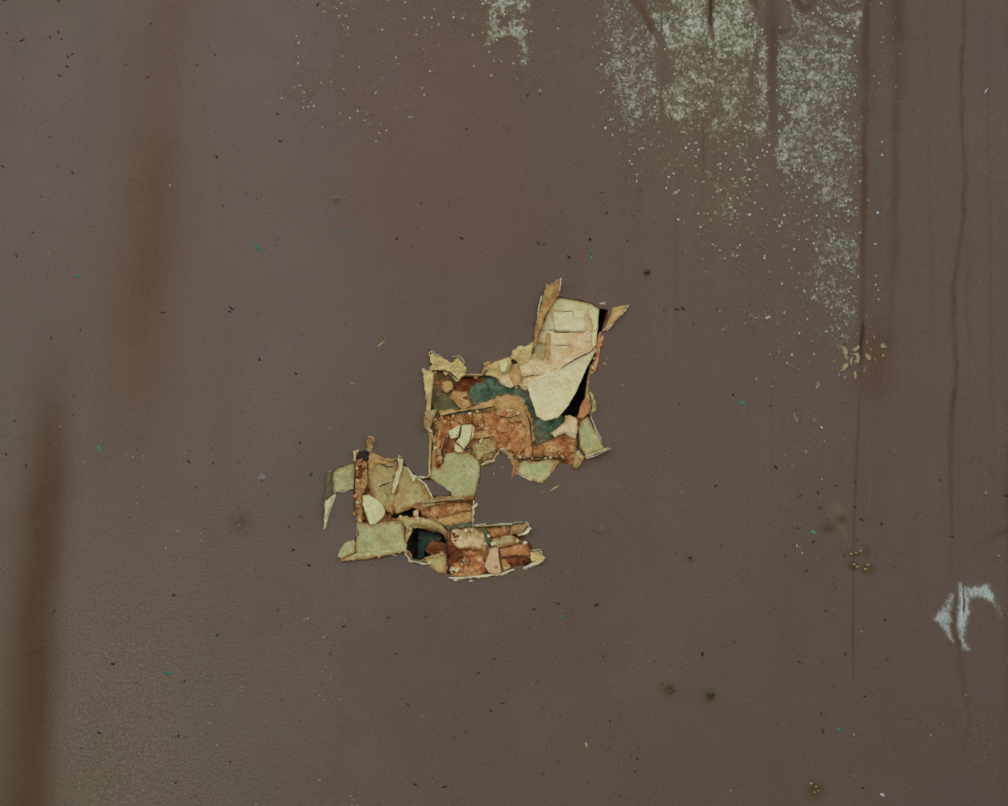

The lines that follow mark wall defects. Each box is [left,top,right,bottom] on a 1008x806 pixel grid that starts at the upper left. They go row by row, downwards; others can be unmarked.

water stain [402,0,559,93]
water stain [592,0,901,379]
peeling [324,278,631,582]